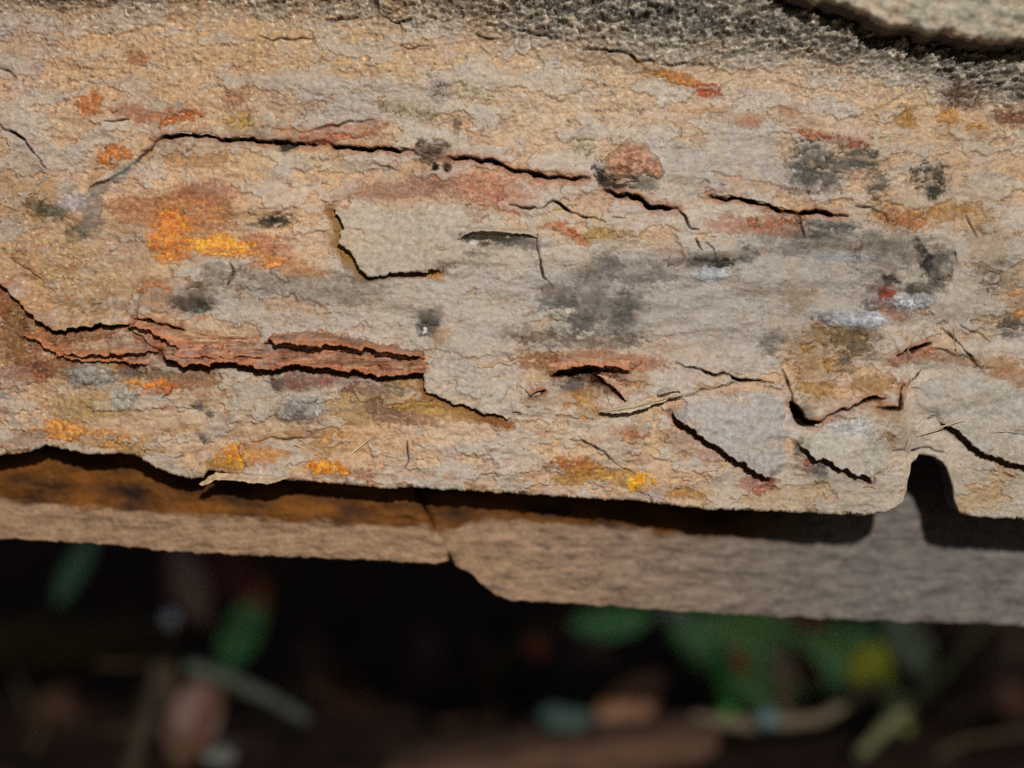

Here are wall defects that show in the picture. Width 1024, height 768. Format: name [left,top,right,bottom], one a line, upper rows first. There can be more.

crack [1,126,46,168]
crack [91,119,415,187]
damp [784,135,888,200]
rust [99,181,324,278]
crack [449,156,714,249]
crack [709,196,889,238]
crack [22,305,185,349]
damp [519,246,760,349]
rust [0,238,900,496]
crack [513,365,628,414]
crack [676,327,989,426]
rust [666,484,705,499]